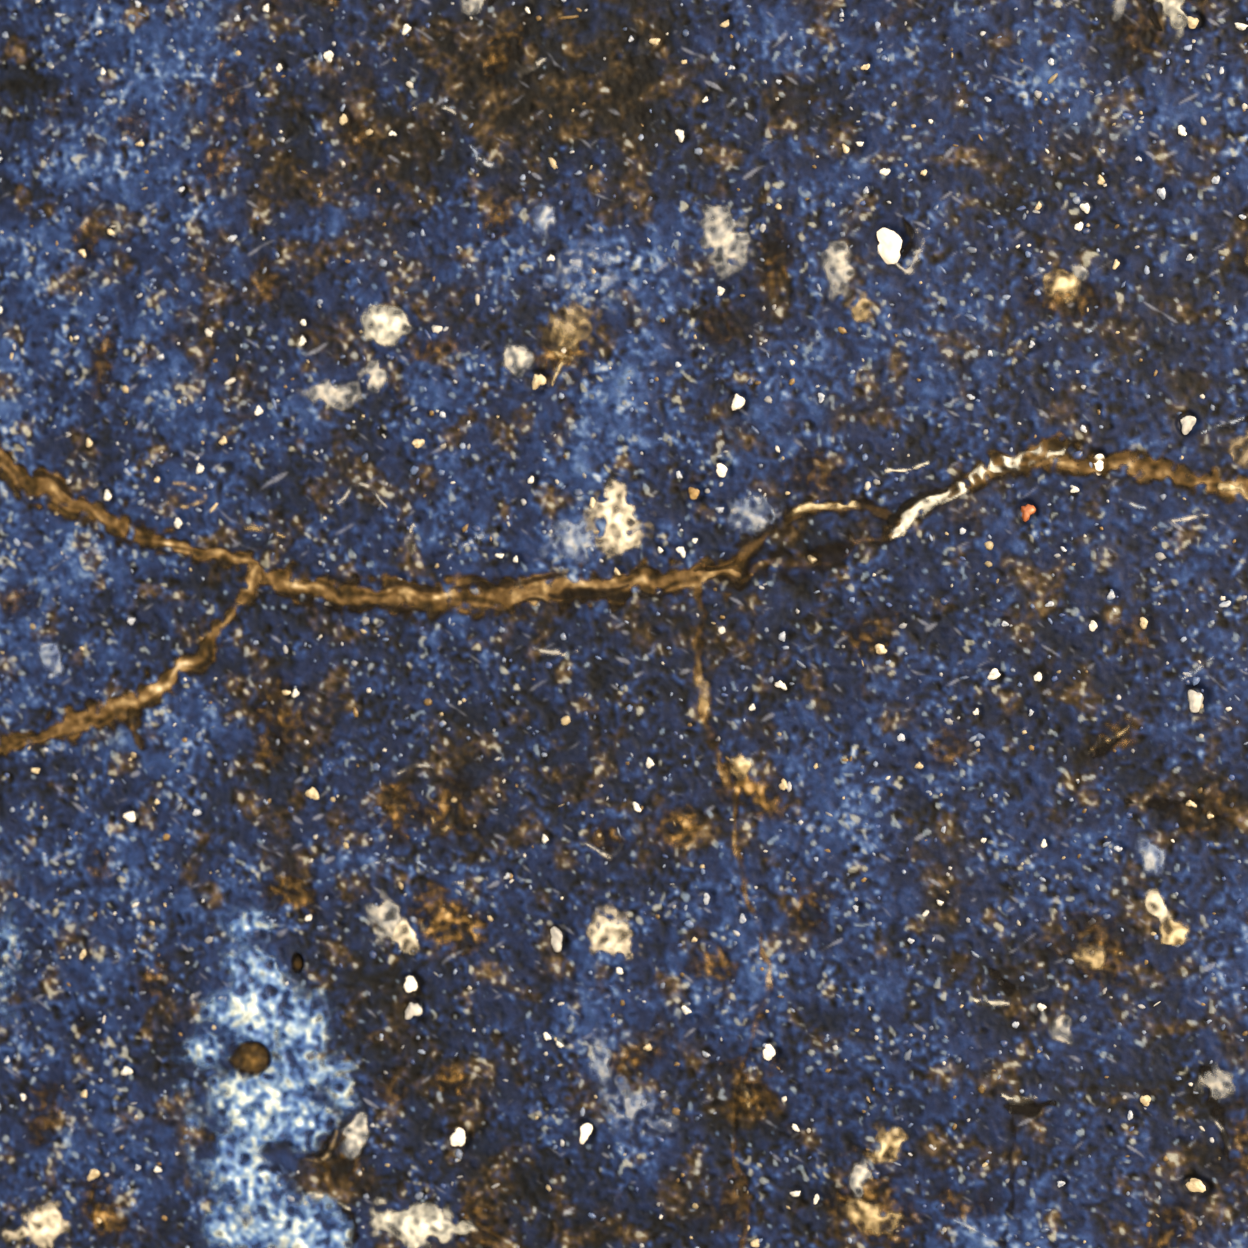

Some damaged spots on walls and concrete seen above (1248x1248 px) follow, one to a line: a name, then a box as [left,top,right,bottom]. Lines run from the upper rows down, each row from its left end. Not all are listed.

crack [0,432,1248,982]
crack [988,968,1020,995]
crack [732,1145,747,1248]